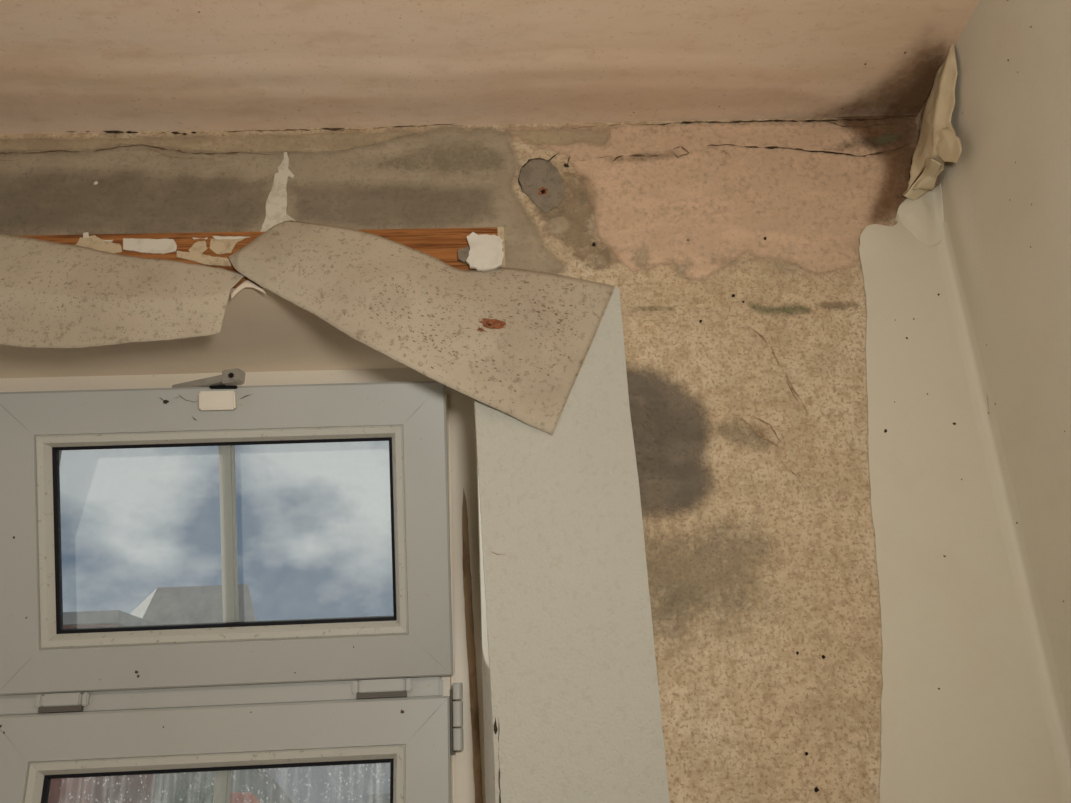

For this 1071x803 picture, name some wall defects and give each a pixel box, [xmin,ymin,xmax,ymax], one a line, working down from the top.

water stain [841,52,942,218]
rust [478,318,506,331]
water stain [626,370,711,515]